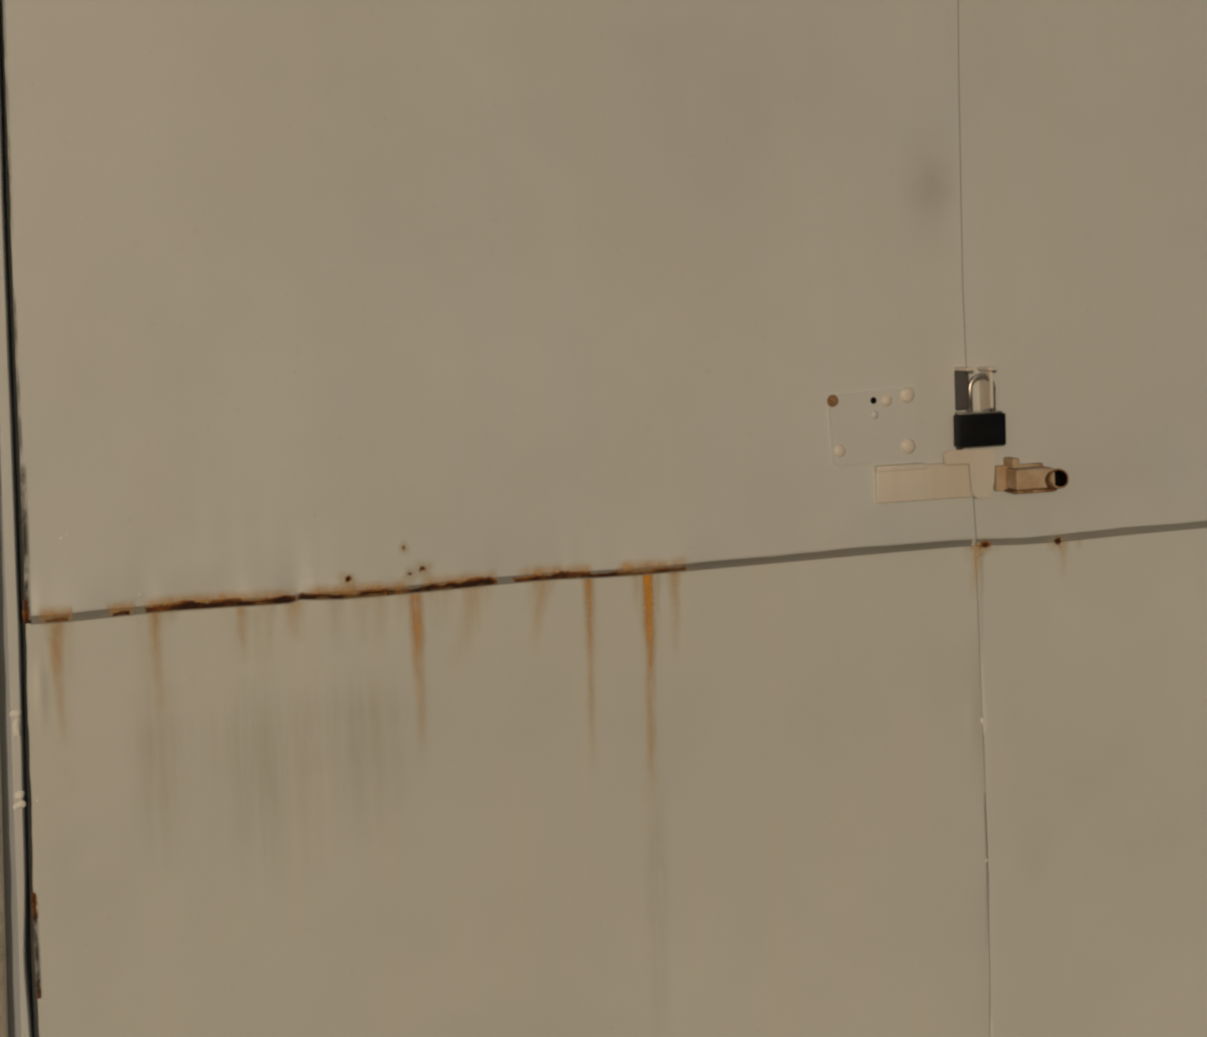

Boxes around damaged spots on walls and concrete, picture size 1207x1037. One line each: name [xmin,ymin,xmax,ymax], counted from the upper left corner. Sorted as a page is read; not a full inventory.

rust [22,581,71,624]
rust [145,566,497,645]
rust [513,566,686,659]
rust [31,892,41,999]